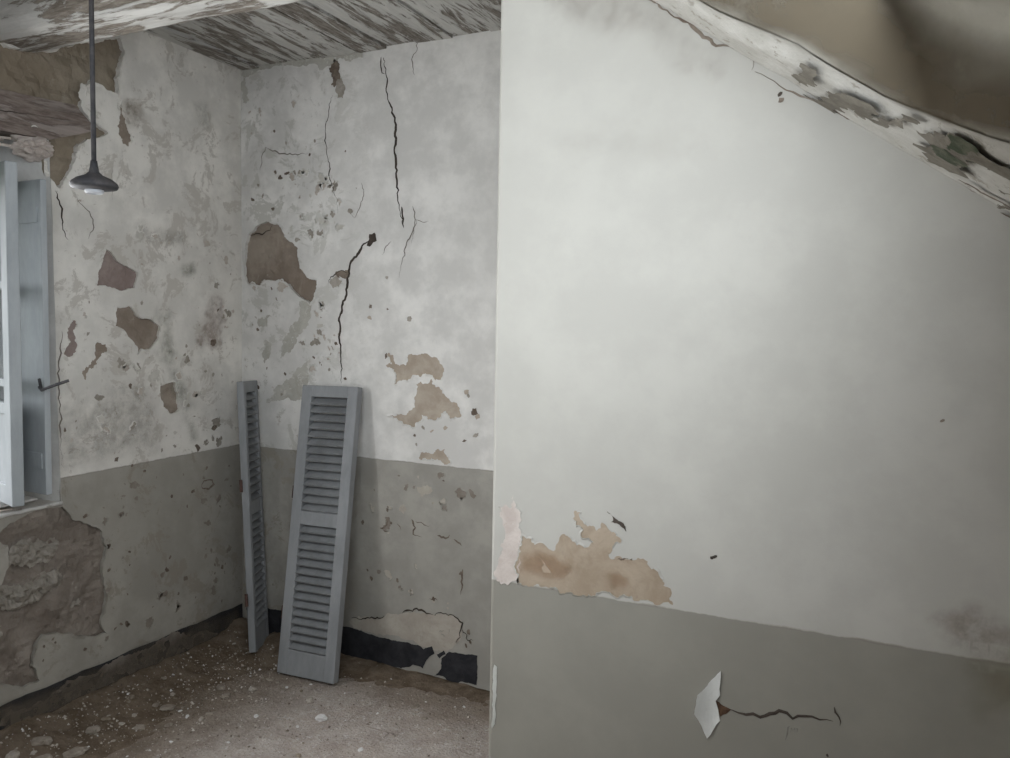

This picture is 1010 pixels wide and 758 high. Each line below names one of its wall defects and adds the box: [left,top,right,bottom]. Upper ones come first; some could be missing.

flaking render [0,36,133,192]
peeling [791,63,1010,180]
flaking render [62,301,107,380]
flaking render [97,248,143,291]
flaking render [113,301,223,452]
flaking render [223,165,353,403]
crack [260,58,428,383]
peeling [385,351,480,512]
flaking render [0,480,140,689]
peeling [349,597,472,652]
peeling [493,497,673,607]
crack [694,671,841,738]